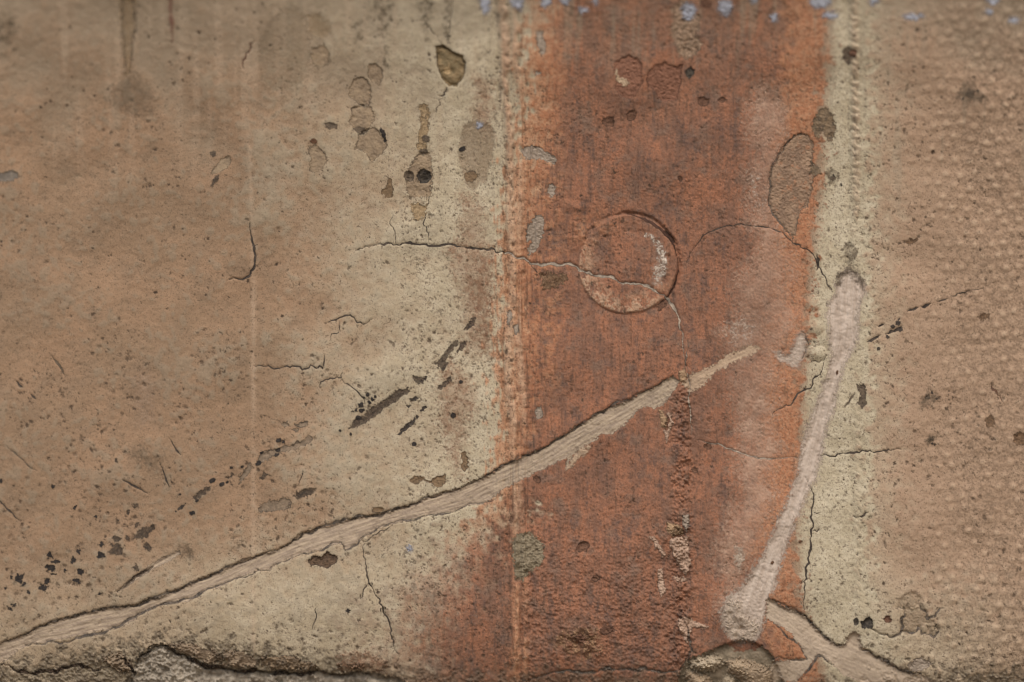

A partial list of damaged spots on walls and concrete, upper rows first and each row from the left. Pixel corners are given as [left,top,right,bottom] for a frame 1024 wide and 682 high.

flaking render [324,63,388,162]
spalling [381,101,434,221]
spalling [435,44,466,87]
peeling [768,107,836,239]
crack [257,314,370,402]
crack [360,200,833,460]
crack [360,527,398,661]
spalling [0,344,761,682]
crack [803,485,820,610]
damp [715,175,935,682]
crack [822,448,898,457]
spalling [678,644,783,682]